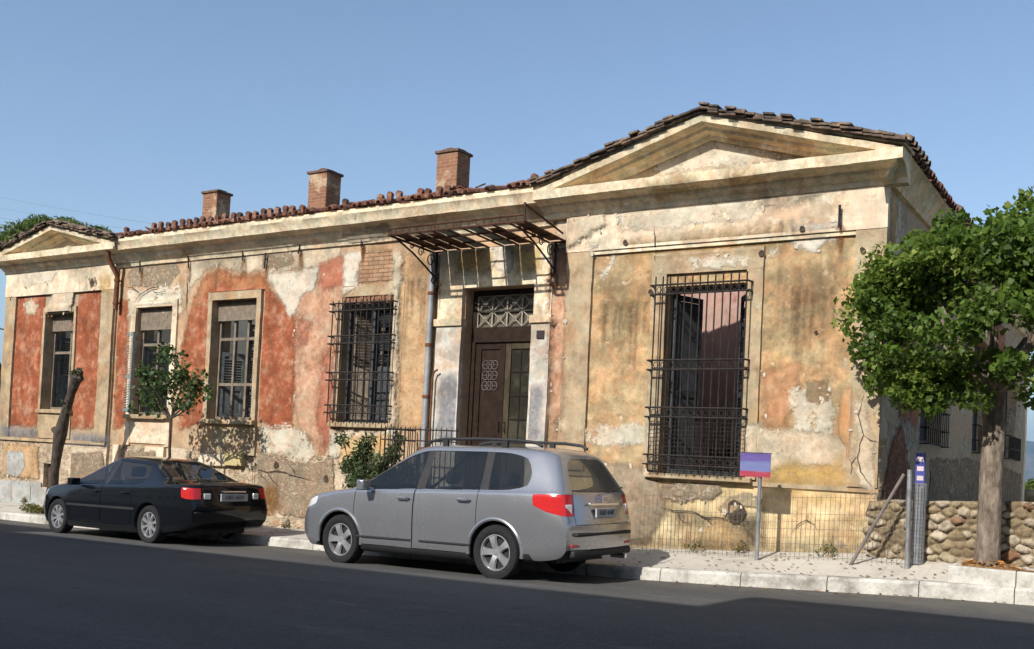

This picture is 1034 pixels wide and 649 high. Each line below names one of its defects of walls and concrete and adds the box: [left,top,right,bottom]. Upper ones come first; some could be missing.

peeling [8,269,101,430]
peeling [113,223,399,518]
peeling [744,379,914,500]
crack [850,395,878,497]
spalling [928,457,980,501]
spalling [1002,467,1022,501]